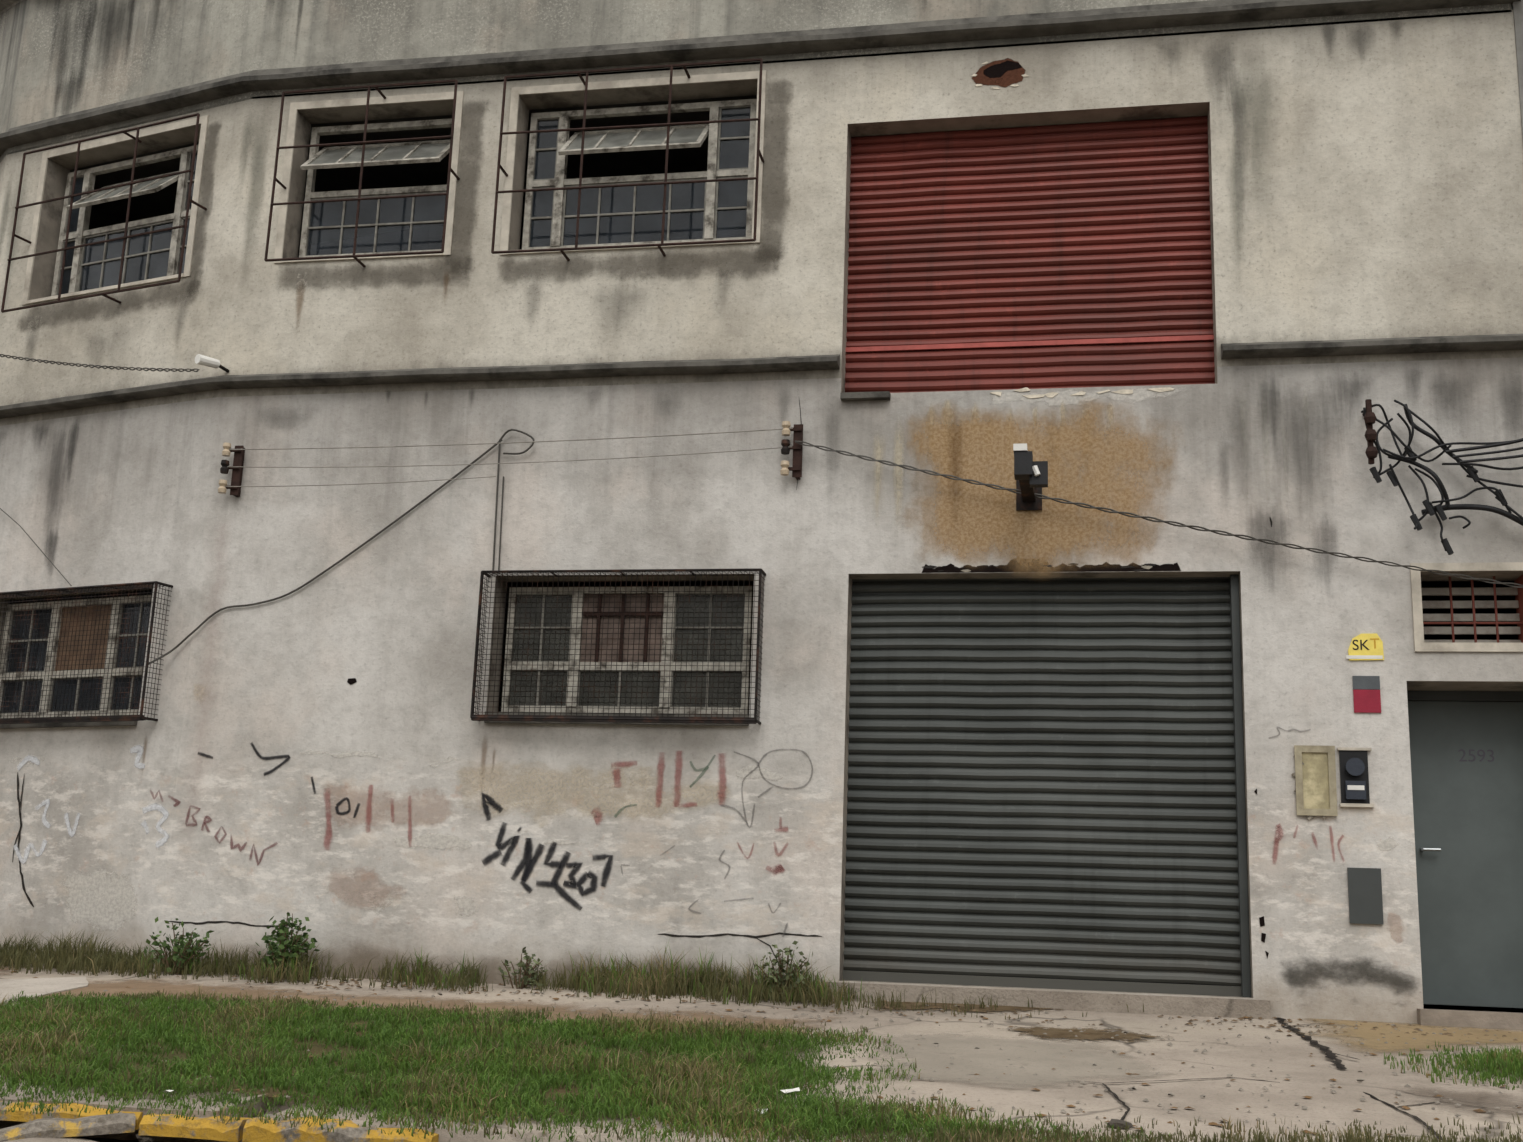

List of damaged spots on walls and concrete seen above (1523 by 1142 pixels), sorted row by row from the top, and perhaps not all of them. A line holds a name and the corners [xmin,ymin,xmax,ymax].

peeling [991,387,1178,406]
spalling [922,559,1181,573]
leakage [1285,961,1413,992]
crack [1276,1017,1490,1141]